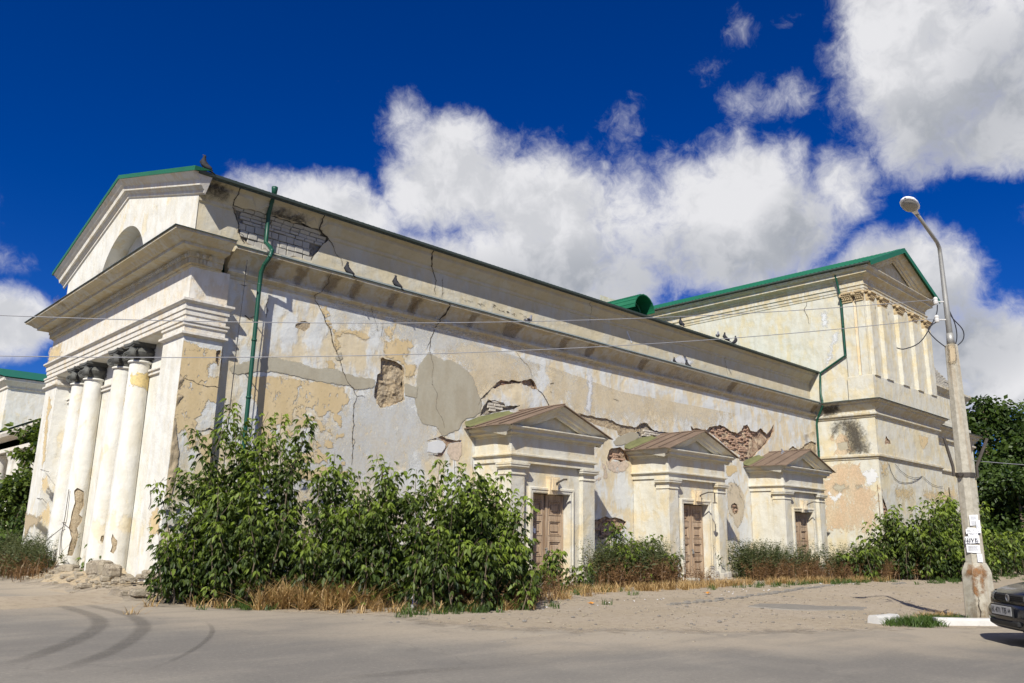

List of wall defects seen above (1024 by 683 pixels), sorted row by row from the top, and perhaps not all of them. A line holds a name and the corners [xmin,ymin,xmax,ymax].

spalling [233,205,328,261]
peeling [166,341,223,499]
crack [314,215,363,457]
spalling [374,317,417,408]
crack [428,250,451,428]
spalling [428,436,462,457]
spalling [481,379,537,415]
spalling [578,413,668,480]
spalling [691,425,774,527]
water stain [822,405,868,454]
peeling [823,434,959,534]
peeling [11,488,158,597]